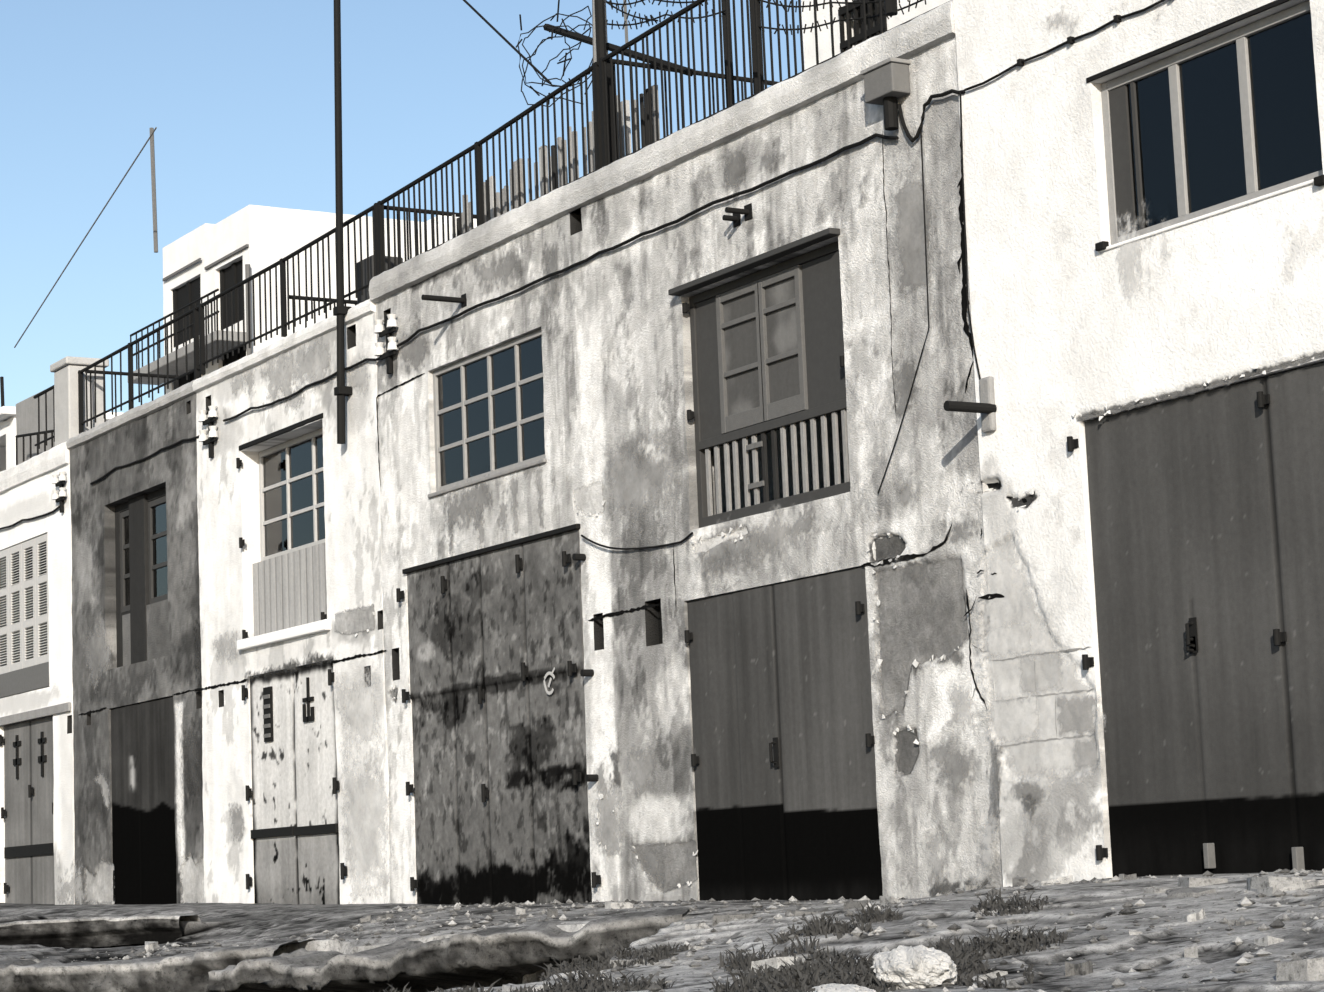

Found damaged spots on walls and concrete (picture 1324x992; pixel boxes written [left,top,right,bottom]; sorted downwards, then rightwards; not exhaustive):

peeling [867,529,1100,784]